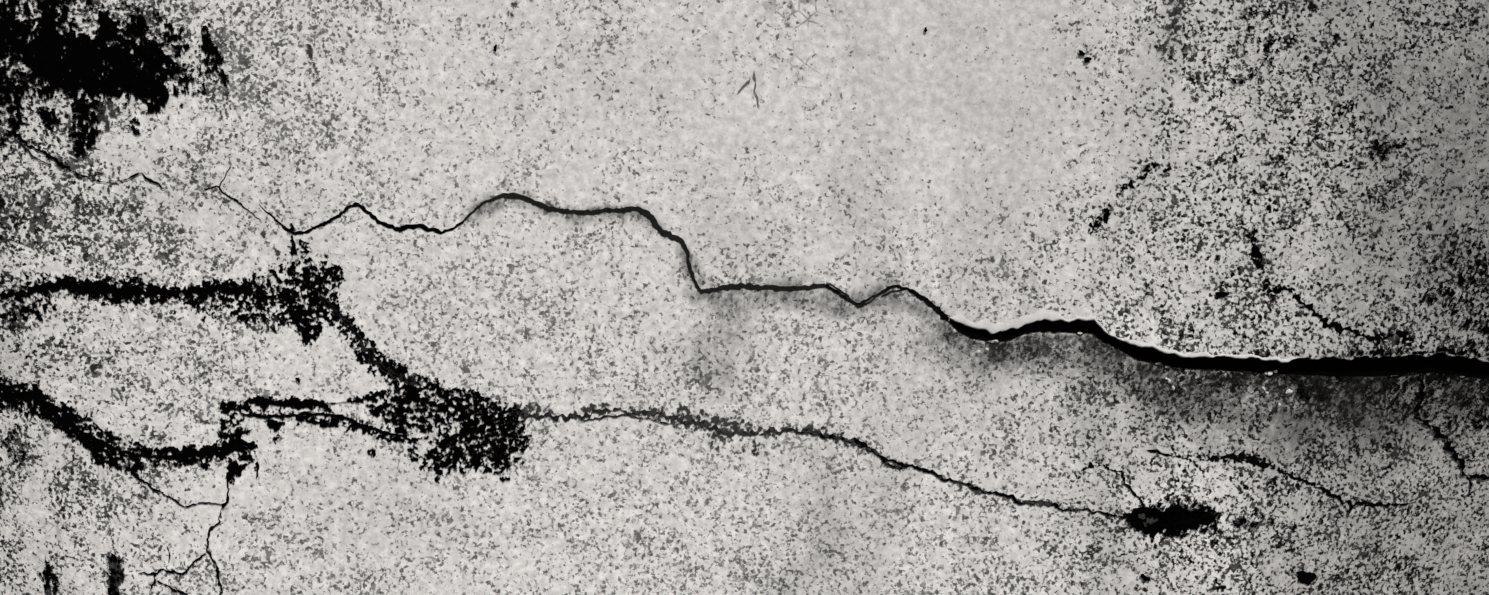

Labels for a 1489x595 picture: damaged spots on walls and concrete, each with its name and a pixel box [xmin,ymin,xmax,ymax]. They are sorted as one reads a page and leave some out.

crack [4,128,169,192]
crack [1088,150,1244,234]
crack [204,166,1489,496]
crack [0,269,441,595]
crack [506,402,1414,519]